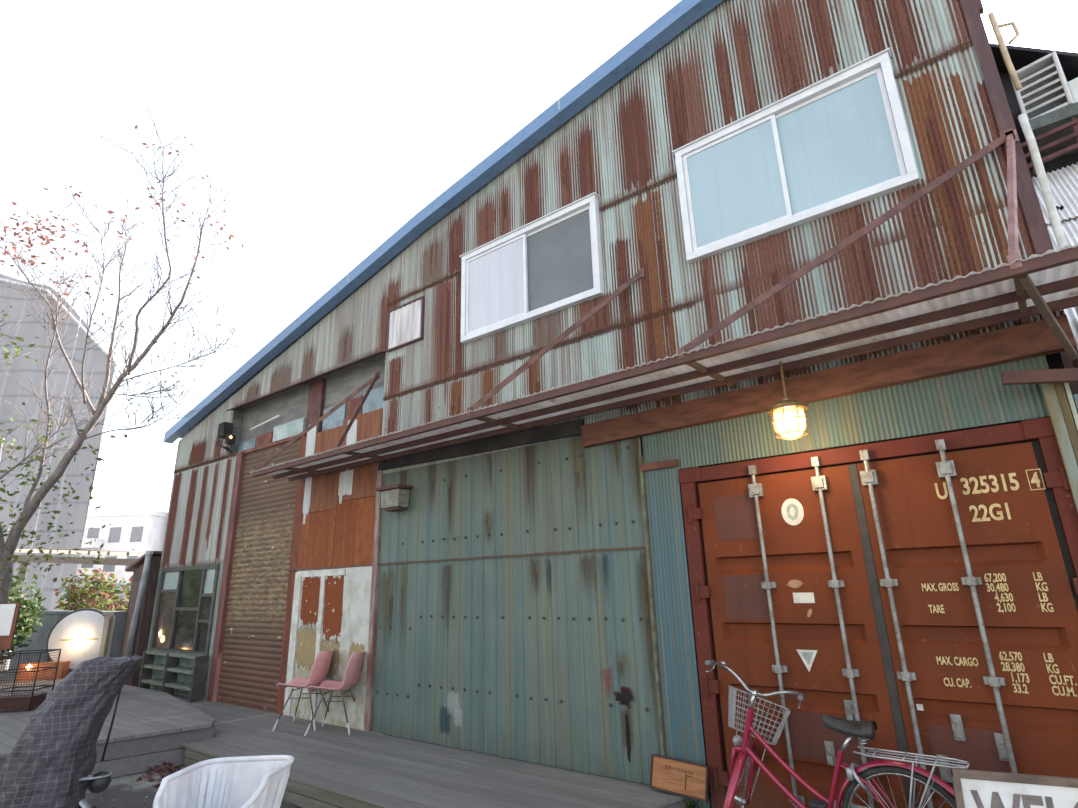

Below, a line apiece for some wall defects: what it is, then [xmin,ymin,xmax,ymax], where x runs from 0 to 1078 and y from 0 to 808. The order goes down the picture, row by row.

corrosion [815,0,1036,311]
corrosion [376,0,845,435]
corrosion [245,342,317,402]
corrosion [338,326,355,364]
corrosion [841,310,1061,365]
corrosion [161,437,237,568]
peeling [296,575,365,678]